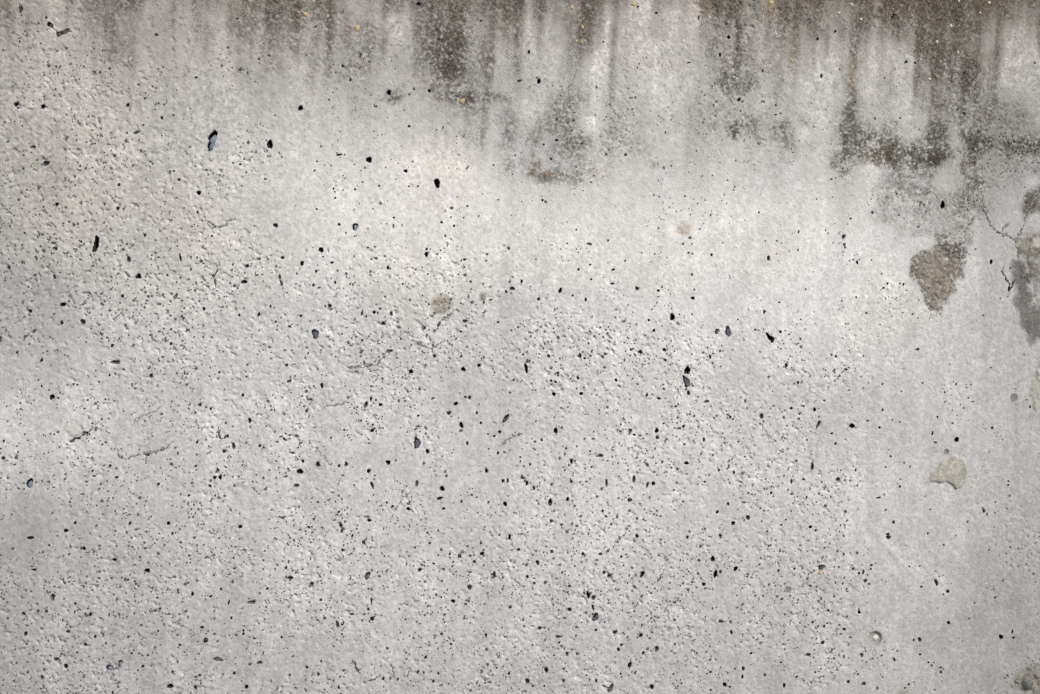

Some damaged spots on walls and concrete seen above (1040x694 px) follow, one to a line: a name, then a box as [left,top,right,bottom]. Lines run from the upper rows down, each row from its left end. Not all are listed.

leakage [242,0,335,39]
leakage [411,0,558,109]
leakage [575,0,618,42]
leakage [700,0,1040,163]
leakage [836,112,942,175]
spalling [910,236,967,310]